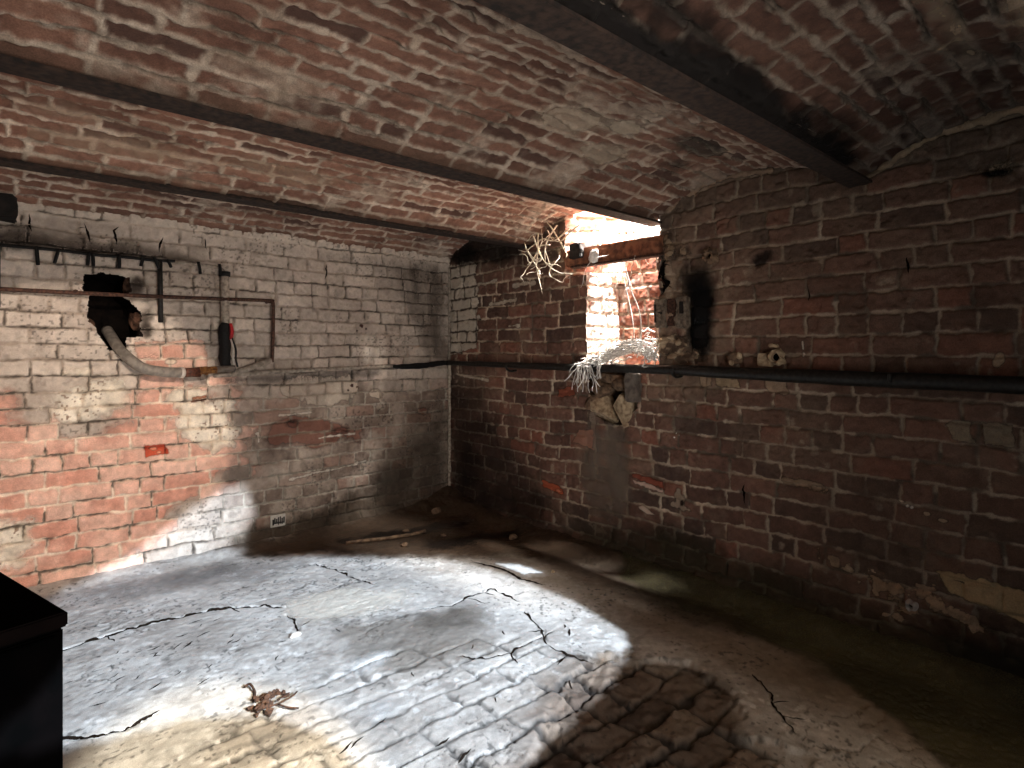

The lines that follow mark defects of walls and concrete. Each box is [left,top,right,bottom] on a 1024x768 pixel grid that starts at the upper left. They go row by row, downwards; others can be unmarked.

water stain [682,267,711,362]
peeling [0,272,382,588]
crack [63,604,299,651]
crack [427,562,594,664]
peeling [817,547,1024,634]
crack [63,710,159,740]
crack [752,674,800,733]